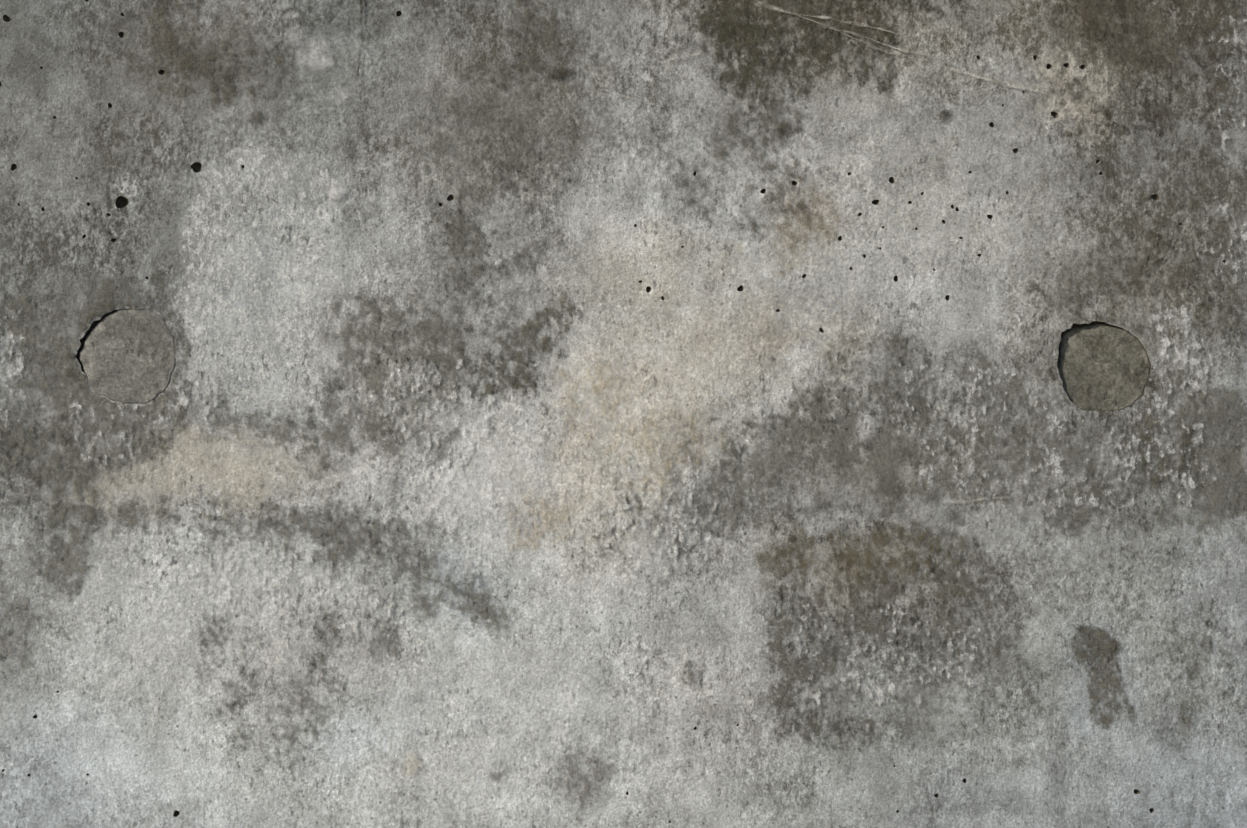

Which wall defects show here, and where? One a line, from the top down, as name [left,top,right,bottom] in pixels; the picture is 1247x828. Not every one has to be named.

leakage [0,0,583,672]
leakage [604,0,1247,752]